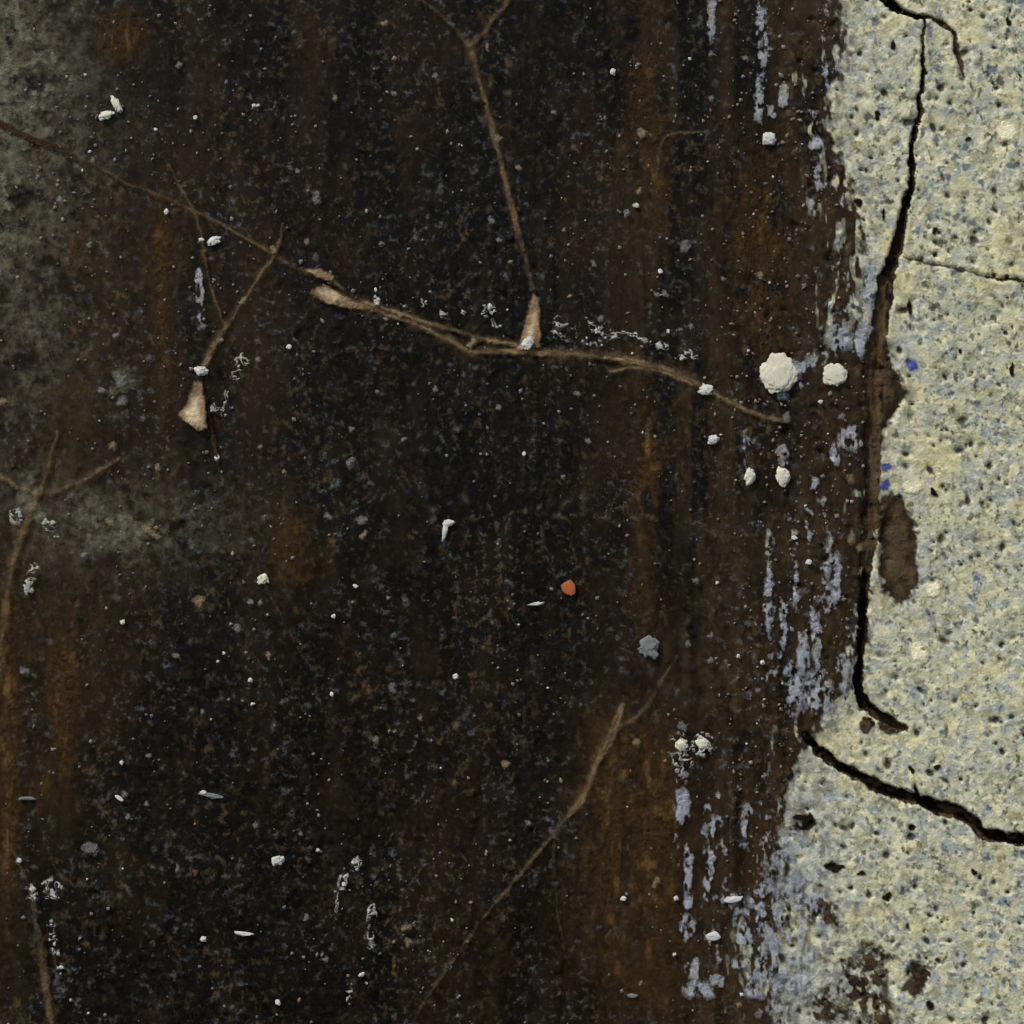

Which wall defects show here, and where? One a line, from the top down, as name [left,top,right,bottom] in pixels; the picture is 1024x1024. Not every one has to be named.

crack [467,0,519,230]
damp [855,257,867,287]
crack [200,323,229,463]
crack [311,282,778,420]
damp [793,360,806,381]
crack [852,0,1024,732]
spalling [878,494,919,603]
crack [567,704,624,817]
crack [803,732,1024,846]
damp [775,849,817,911]
damp [764,922,785,970]
damp [771,949,810,1001]